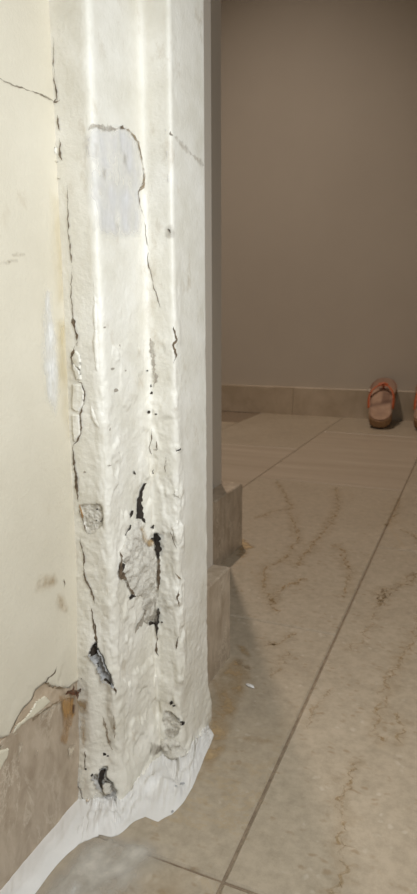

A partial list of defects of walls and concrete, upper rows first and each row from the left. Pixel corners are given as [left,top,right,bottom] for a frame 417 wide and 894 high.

crack [7,46,62,160]
crack [138,150,160,306]
crack [67,190,96,635]
crack [146,327,178,472]
flaking render [79,504,103,534]
flaking render [118,483,163,656]
peeling [172,520,183,546]
flaking render [88,624,117,693]
peeling [0,667,73,747]
crack [103,718,116,750]
flaking render [155,701,187,760]
flaking render [84,752,117,802]